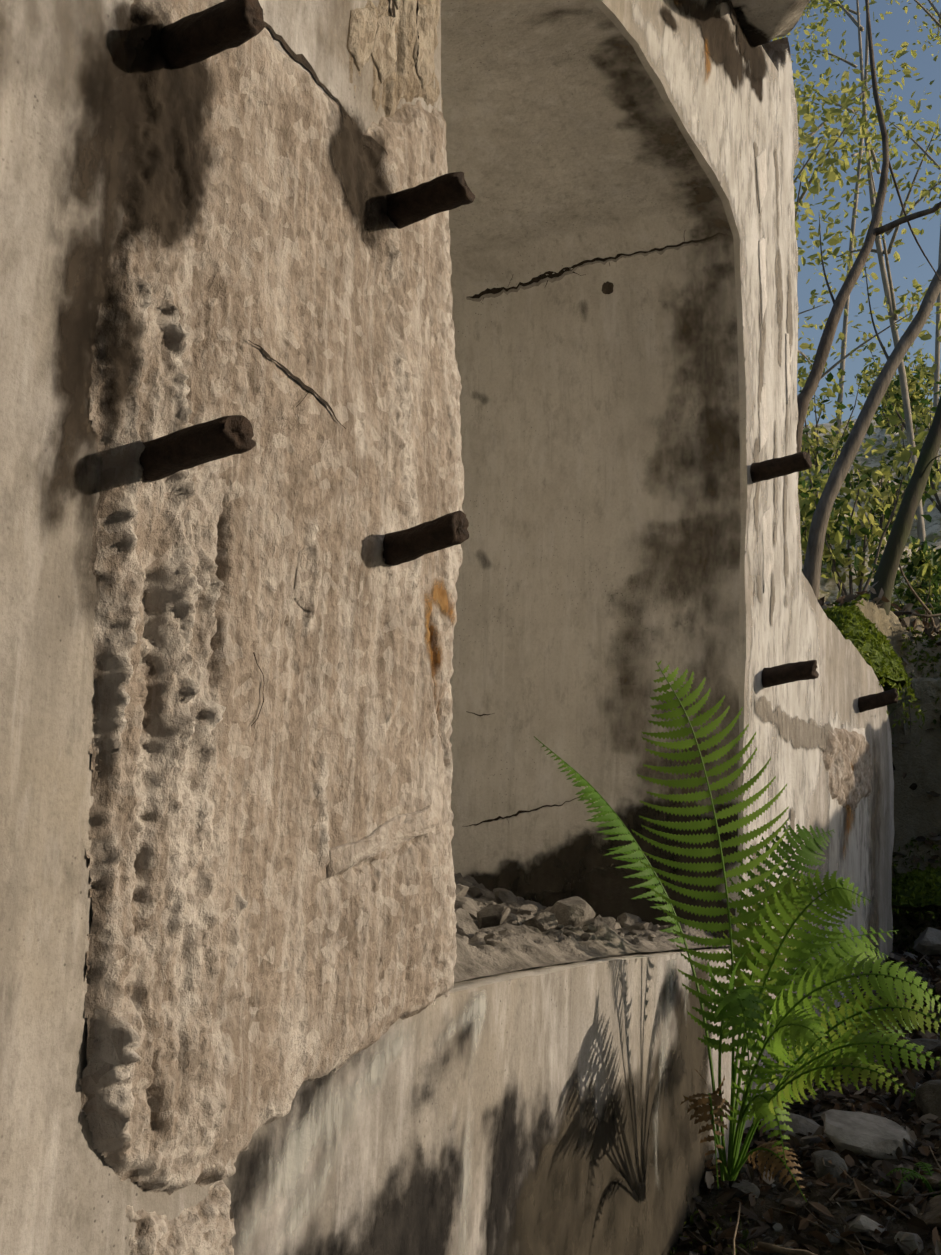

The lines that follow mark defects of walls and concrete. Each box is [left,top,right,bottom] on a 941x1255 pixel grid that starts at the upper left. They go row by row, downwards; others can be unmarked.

crack [264,21,388,155]
leakage [594,37,732,238]
crack [466,231,728,302]
leakage [654,265,740,499]
peeling [754,141,793,463]
spalling [78,0,464,1255]
rust [425,581,454,684]
peeling [754,475,789,626]
spalling [755,696,873,811]
leakage [230,1068,351,1244]
leakage [286,1146,470,1255]
leakage [483,959,714,1255]